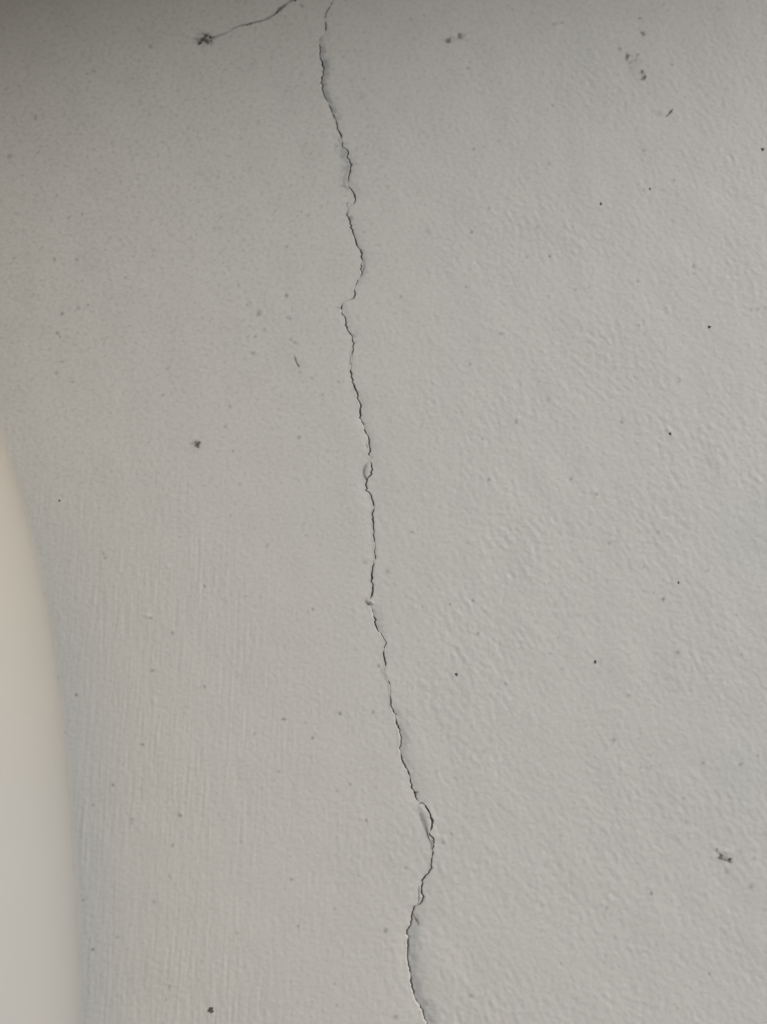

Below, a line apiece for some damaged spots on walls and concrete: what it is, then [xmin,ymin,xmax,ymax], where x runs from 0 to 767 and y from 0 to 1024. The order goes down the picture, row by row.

crack [198,34,212,45]
crack [319,1,434,1019]